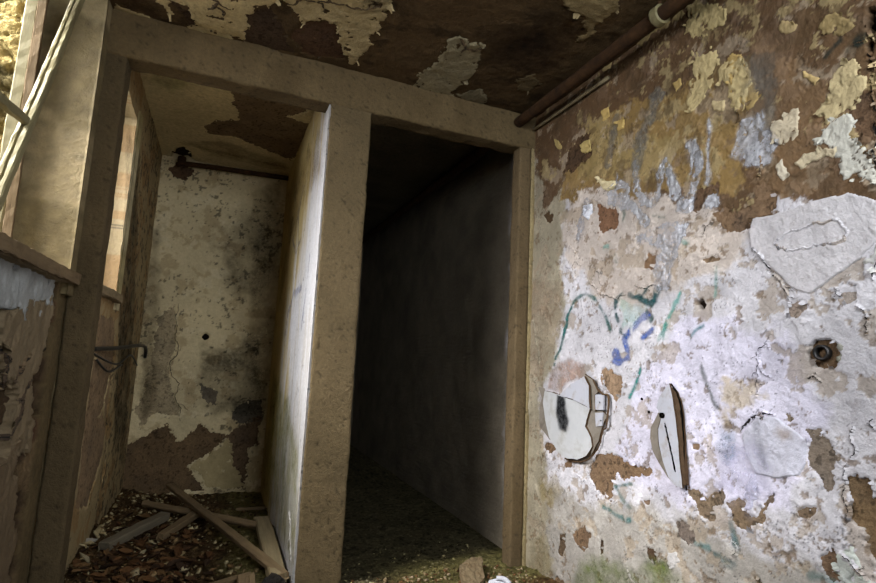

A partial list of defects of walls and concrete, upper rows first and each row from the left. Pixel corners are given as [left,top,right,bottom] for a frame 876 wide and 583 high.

crack [207,0,231,17]
peeling [155,0,394,66]
crack [288,0,380,11]
peeling [637,1,762,113]
peeling [776,11,876,185]
crack [852,30,876,171]
flaking render [713,181,779,233]
flaking render [122,305,265,495]
flaking render [589,452,653,502]
flaking render [684,473,774,534]
flaking render [805,428,845,492]
flaking render [815,474,876,583]